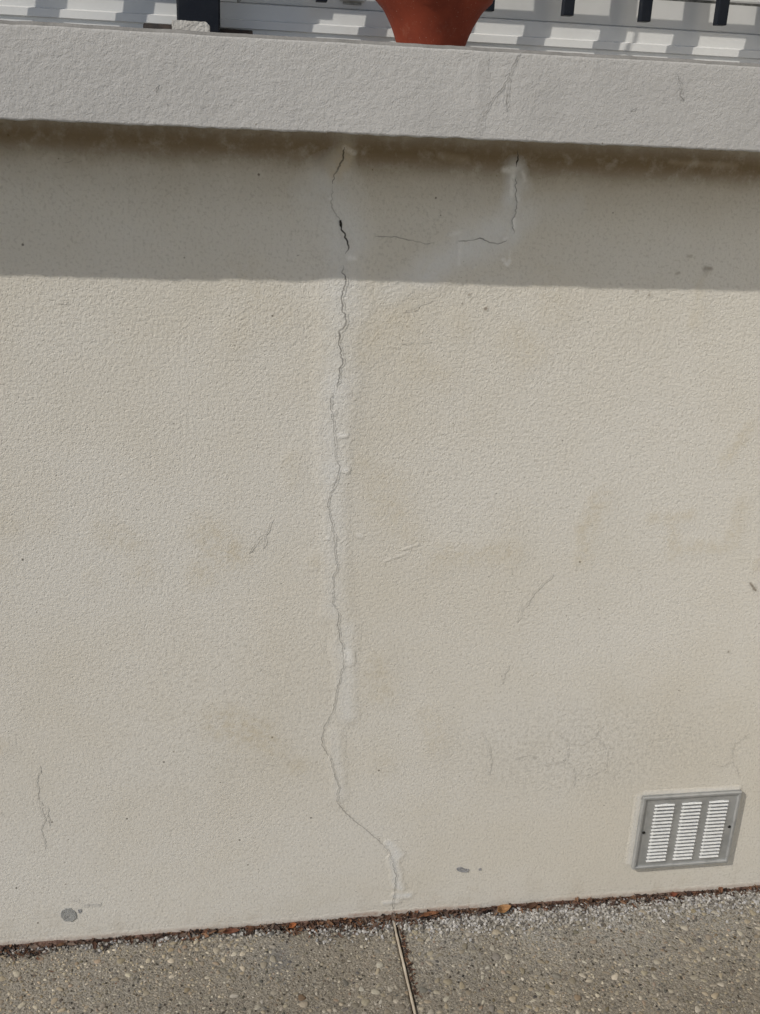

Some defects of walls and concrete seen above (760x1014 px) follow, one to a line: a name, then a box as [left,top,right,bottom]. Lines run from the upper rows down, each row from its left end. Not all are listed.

crack [284,135,587,913]